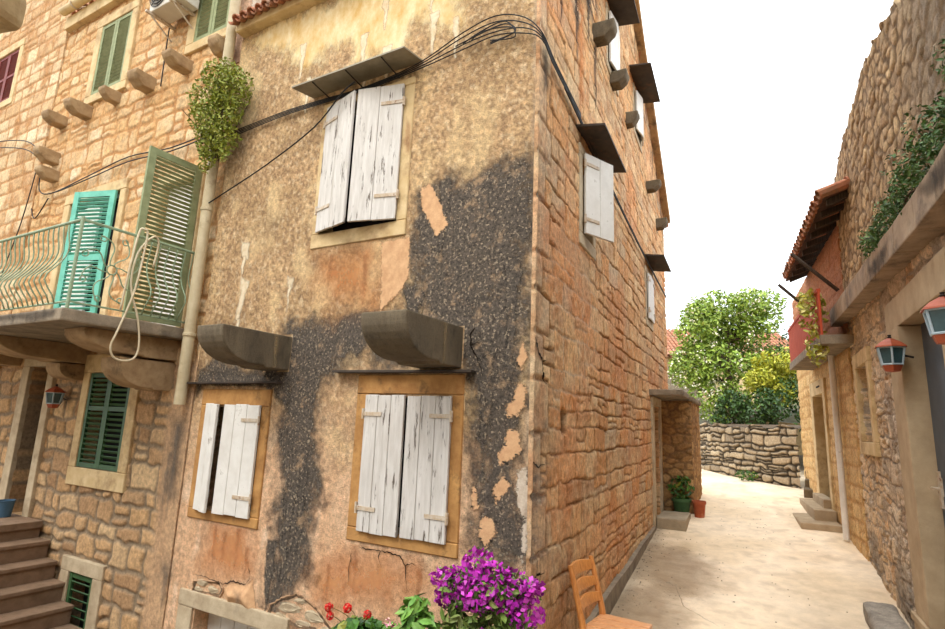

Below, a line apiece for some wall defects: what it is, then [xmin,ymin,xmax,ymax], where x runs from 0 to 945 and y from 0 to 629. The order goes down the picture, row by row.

flaking render [420,183,448,236]
damp [235,241,250,327]
damp [403,153,545,568]
flaking render [516,342,528,370]
damp [197,277,406,613]
flaking render [491,383,528,563]
flaking render [471,486,498,549]
crack [348,547,414,593]